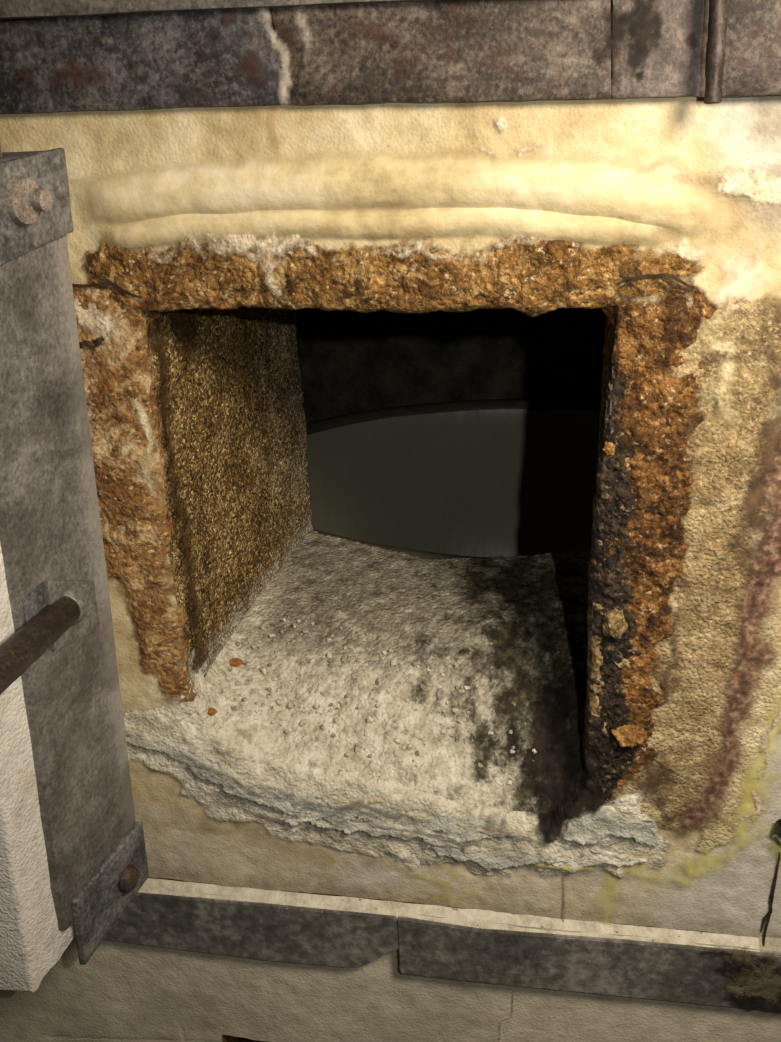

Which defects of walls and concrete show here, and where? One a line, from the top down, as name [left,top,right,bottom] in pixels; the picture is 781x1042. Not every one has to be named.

spalling [73,232,781,878]
damp [411,555,604,843]
crack [761,852,780,946]